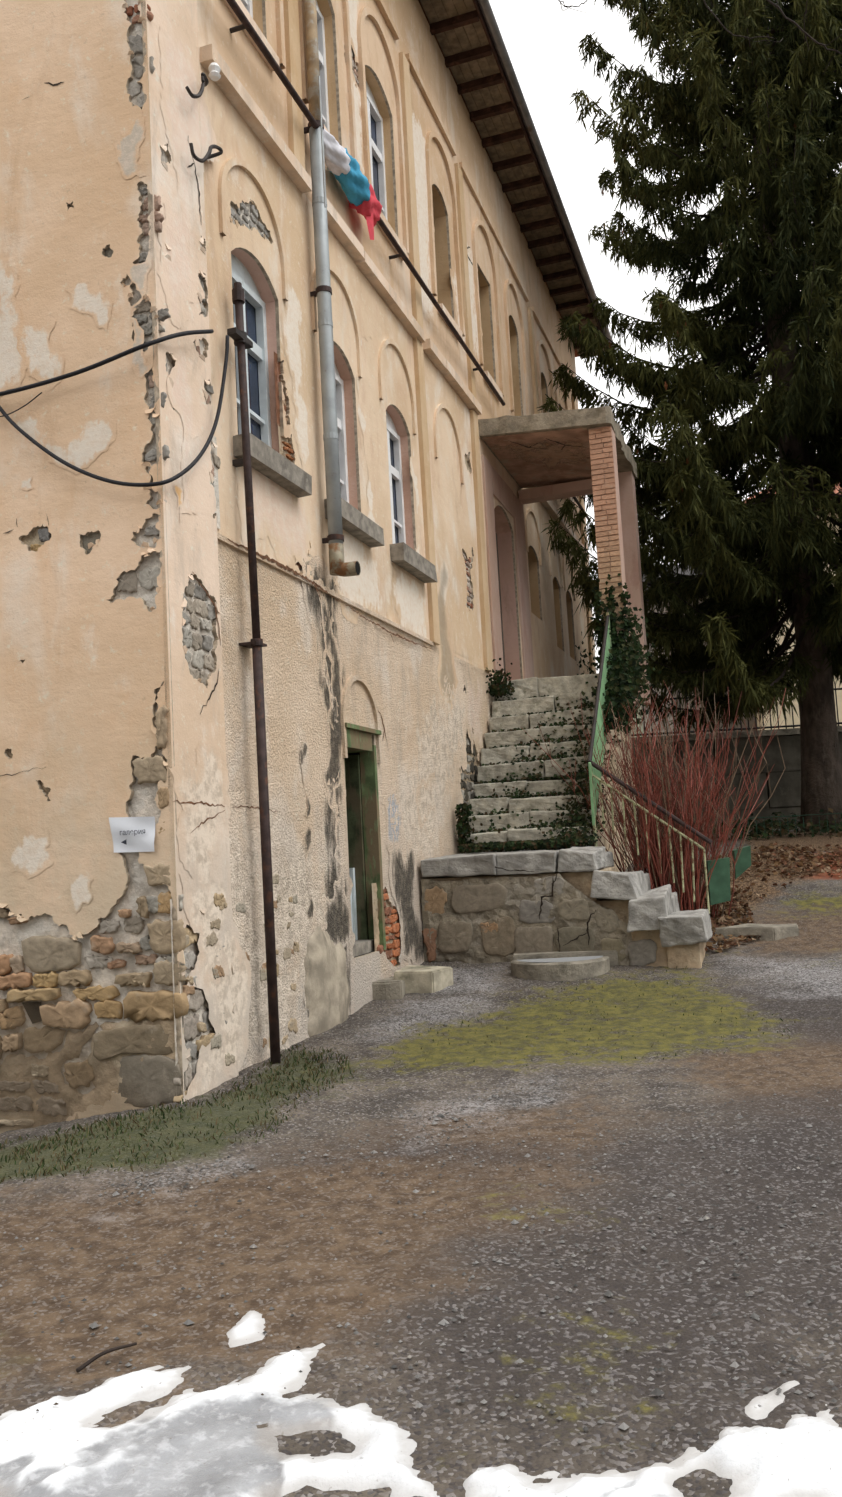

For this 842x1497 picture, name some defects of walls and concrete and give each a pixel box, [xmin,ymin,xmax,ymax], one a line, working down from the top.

peeling [341,0,365,176]
peeling [0,0,314,612]
peeling [357,374,380,526]
peeling [410,421,420,554]
spalling [182,575,220,685]
peeling [334,530,432,651]
damp [300,553,356,1016]
flaking render [0,689,327,1134]
spalling [372,883,406,967]